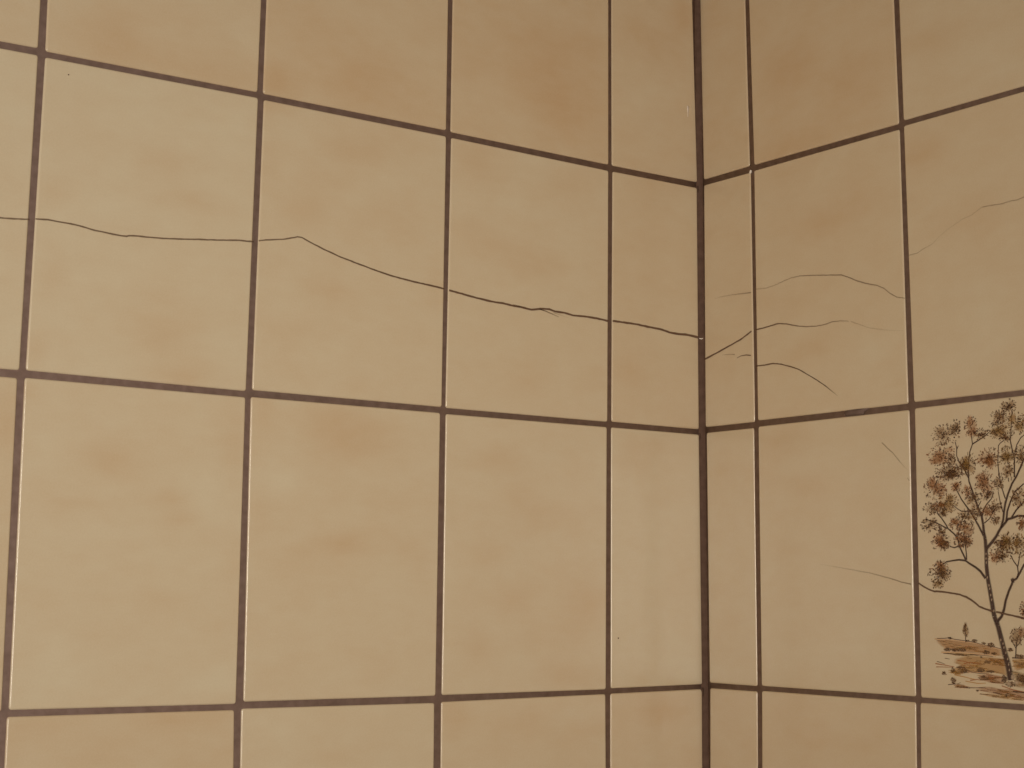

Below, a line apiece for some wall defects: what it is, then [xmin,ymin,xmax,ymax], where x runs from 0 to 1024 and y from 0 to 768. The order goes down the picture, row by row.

crack [0,217,830,390]